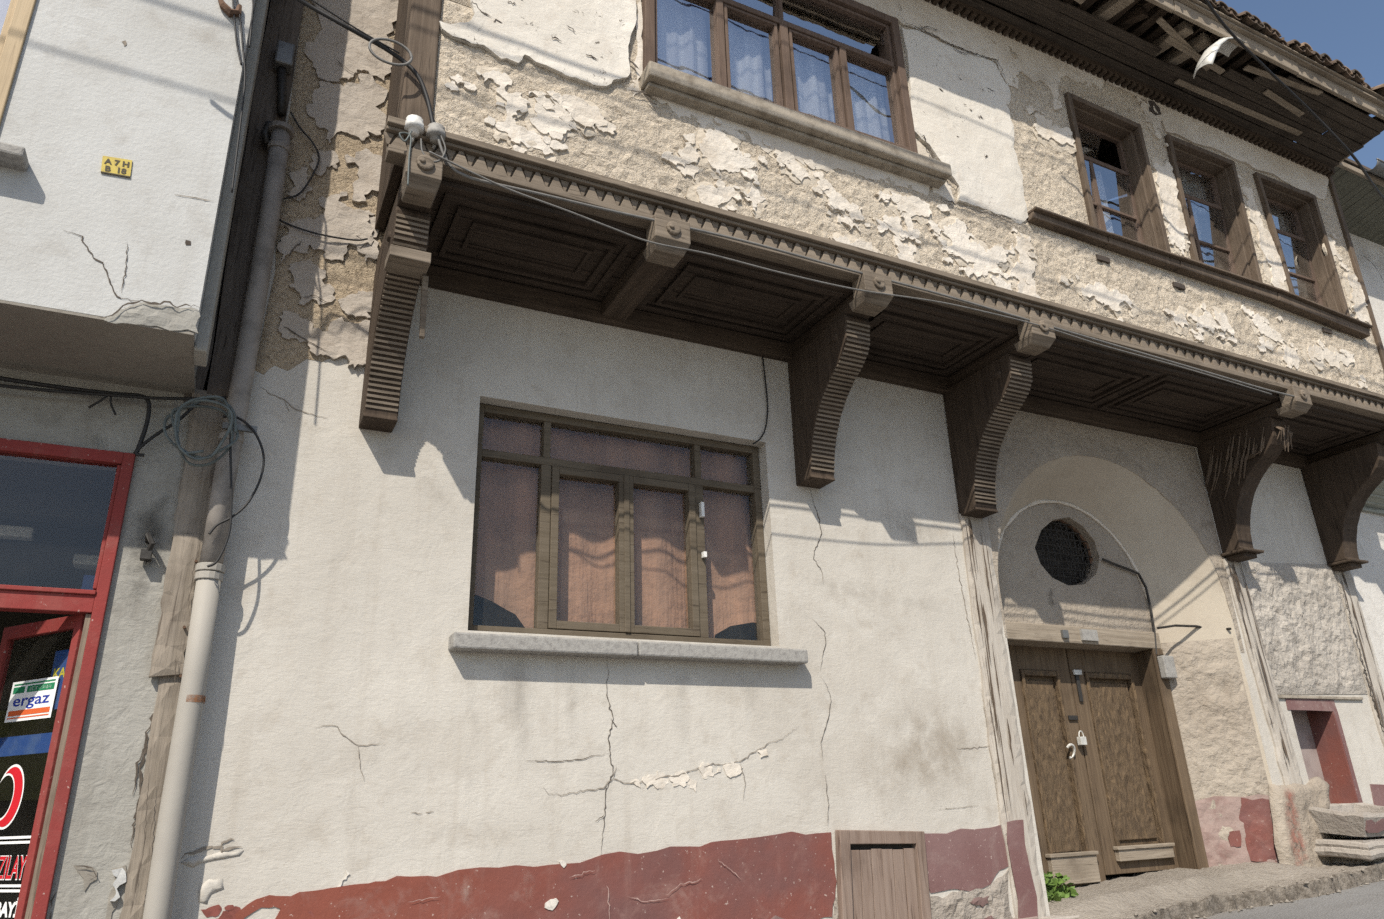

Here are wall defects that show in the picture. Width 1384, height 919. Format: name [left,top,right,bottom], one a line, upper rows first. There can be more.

peeling [255,0,398,374]
spalling [433,0,1384,395]
crack [66,231,200,318]
crack [811,494,824,584]
crack [322,725,377,778]
crack [533,620,831,877]
spalling [631,762,743,792]
spalling [544,898,558,910]